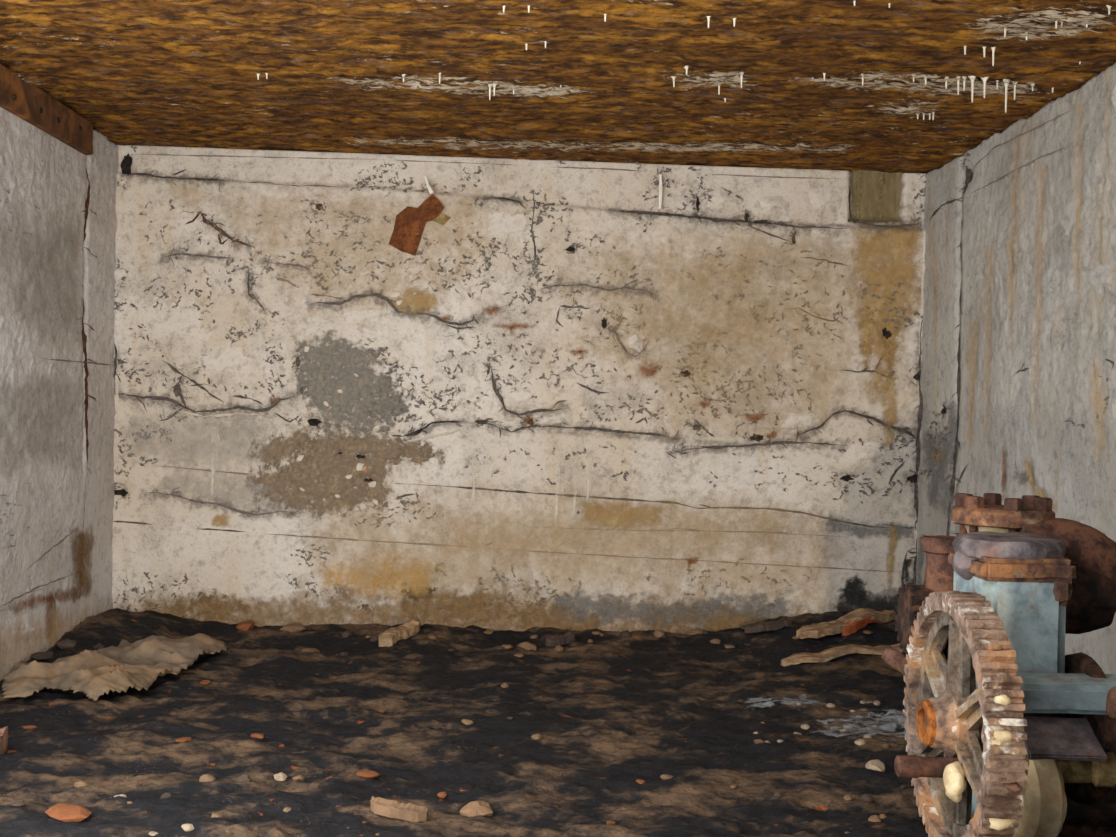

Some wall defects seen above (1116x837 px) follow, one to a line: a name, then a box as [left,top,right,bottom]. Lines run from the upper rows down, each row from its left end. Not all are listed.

efflorescence [964,0,1116,41]
efflorescence [327,74,593,99]
efflorescence [789,70,1039,118]
crack [81,170,97,257]
crack [131,169,351,190]
damp [344,137,855,153]
crack [163,211,481,330]
spalling [114,160,949,528]
crack [392,165,968,585]
damp [851,170,921,443]
corrosion [15,574,83,636]
damp [144,559,786,634]